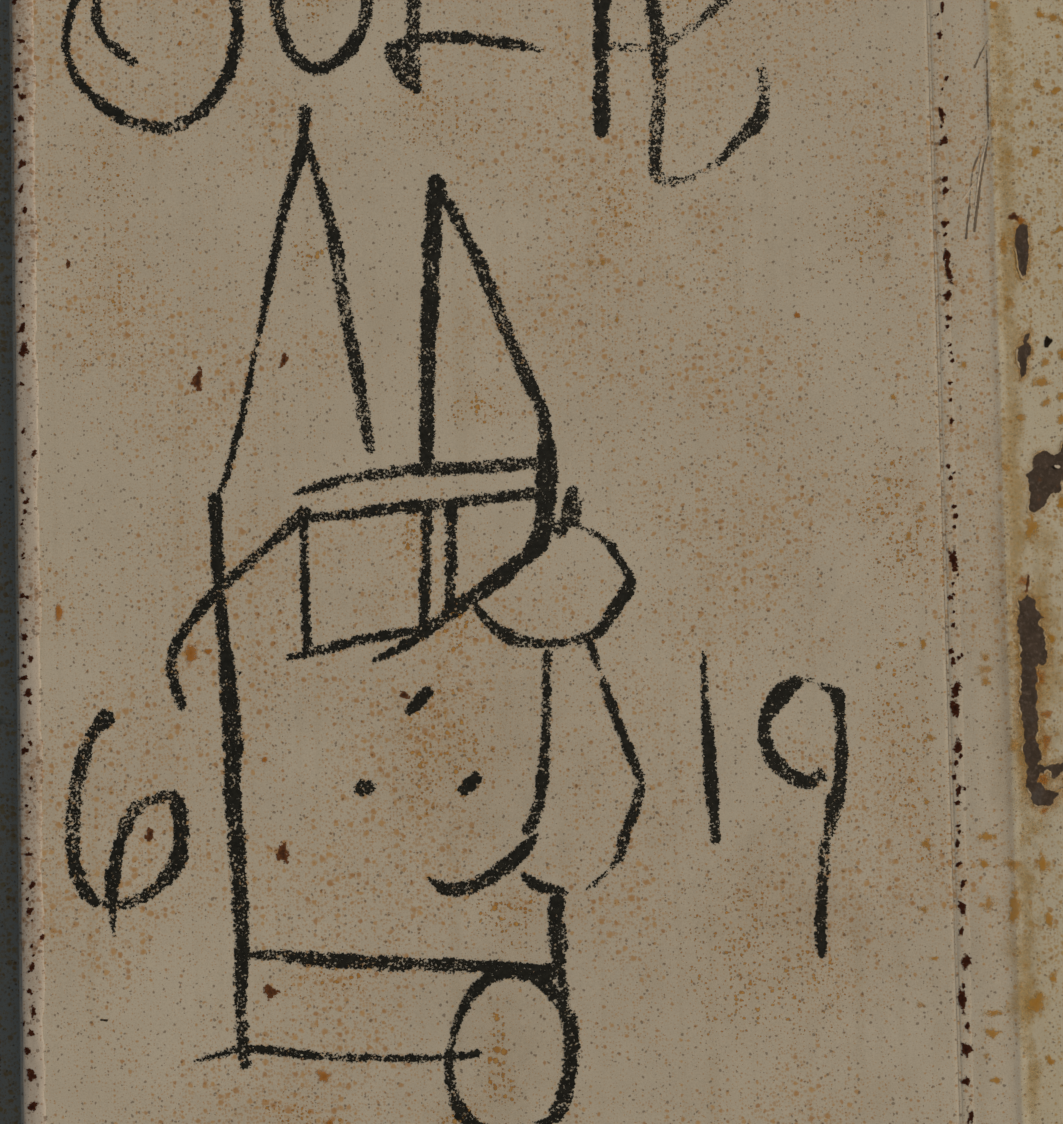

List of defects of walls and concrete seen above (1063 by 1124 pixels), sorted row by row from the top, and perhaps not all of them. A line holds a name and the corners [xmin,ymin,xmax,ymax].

rust [13,21,26,100]
rust [939,107,948,146]
rust [941,220,953,300]
rust [18,322,30,358]
peeling [1026,441,1063,537]
rust [17,593,34,705]
rust [848,437,967,935]
peeling [1016,575,1063,813]
rust [20,837,36,921]
rust [23,988,36,1055]
rust [958,953,972,1030]
rust [961,1043,989,1058]